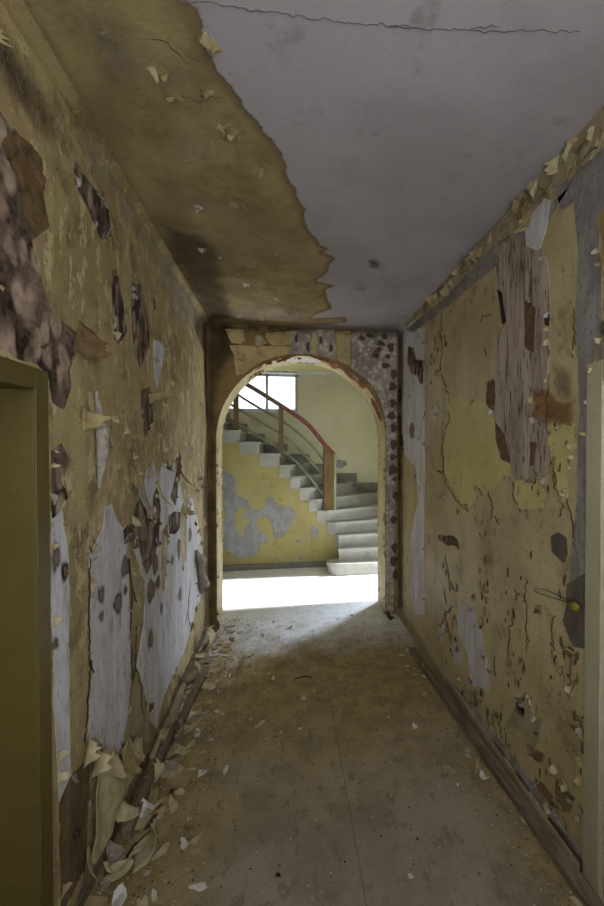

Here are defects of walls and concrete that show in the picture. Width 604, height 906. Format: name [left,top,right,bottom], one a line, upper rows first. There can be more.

peeling [145,62,184,103]
peeling [198,31,222,55]
crack [192,1,579,34]
peeling [2,130,50,237]
peeling [72,159,112,240]
damp [0,111,78,409]
peeling [398,106,604,615]
peeling [51,443,91,906]
peeling [436,555,587,873]